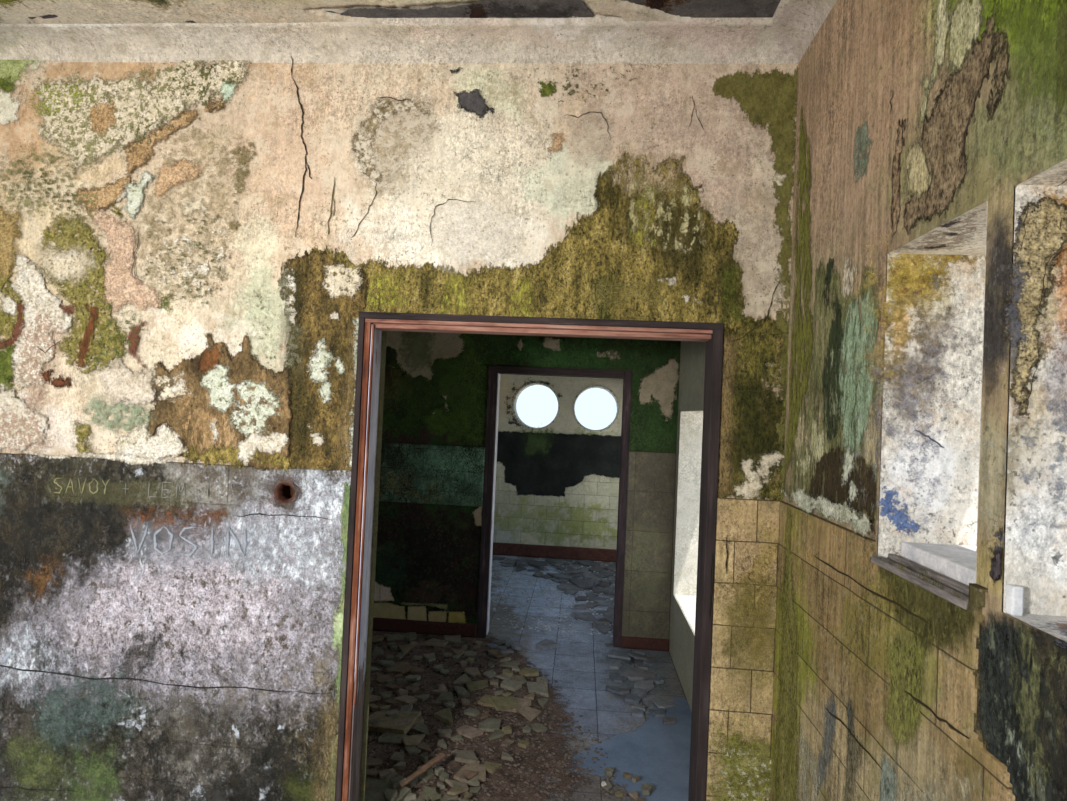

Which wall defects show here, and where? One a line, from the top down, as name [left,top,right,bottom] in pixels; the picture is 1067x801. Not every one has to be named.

spalling [326,0,594,18]
spalling [621,0,781,18]
crack [291,57,335,236]
peeling [0,253,294,471]
rust [266,474,303,517]
peeling [497,377,621,497]
rust [1047,401,1067,513]
leakage [0,332,357,801]
crack [0,665,330,694]
leakage [797,694,862,801]
leakage [878,560,974,801]
crack [904,690,969,739]